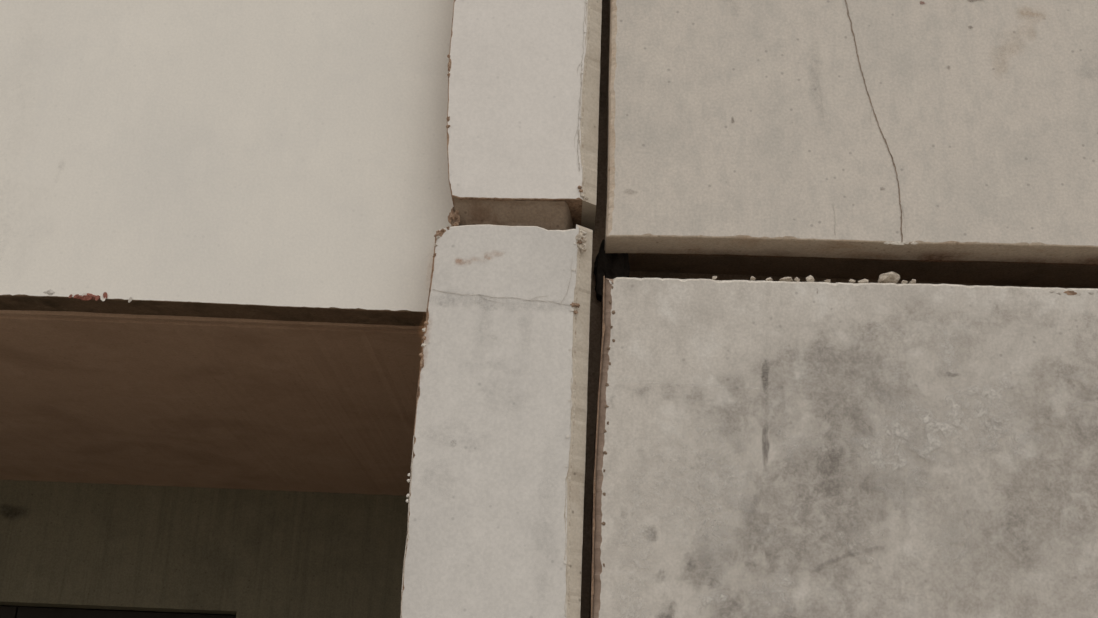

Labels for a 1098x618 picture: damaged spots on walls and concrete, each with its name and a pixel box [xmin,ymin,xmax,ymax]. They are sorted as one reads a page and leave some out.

crack [845,0,906,242]